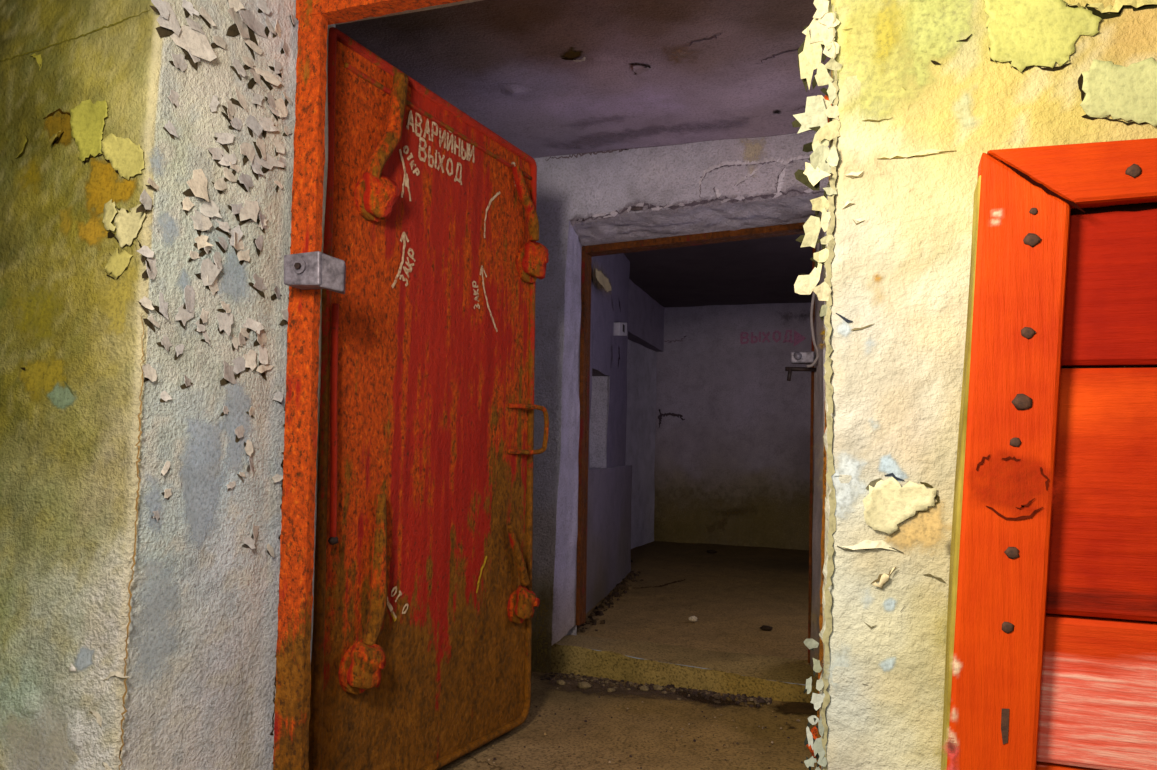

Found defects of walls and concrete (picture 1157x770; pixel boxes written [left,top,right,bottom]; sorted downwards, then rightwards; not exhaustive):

peeling [43,0,297,386]
crack [699,148,830,200]
peeling [20,357,76,409]
peeling [142,364,193,402]
peeling [571,0,1157,770]
peeling [226,406,255,491]
peeling [151,461,172,522]
peeling [242,524,275,558]